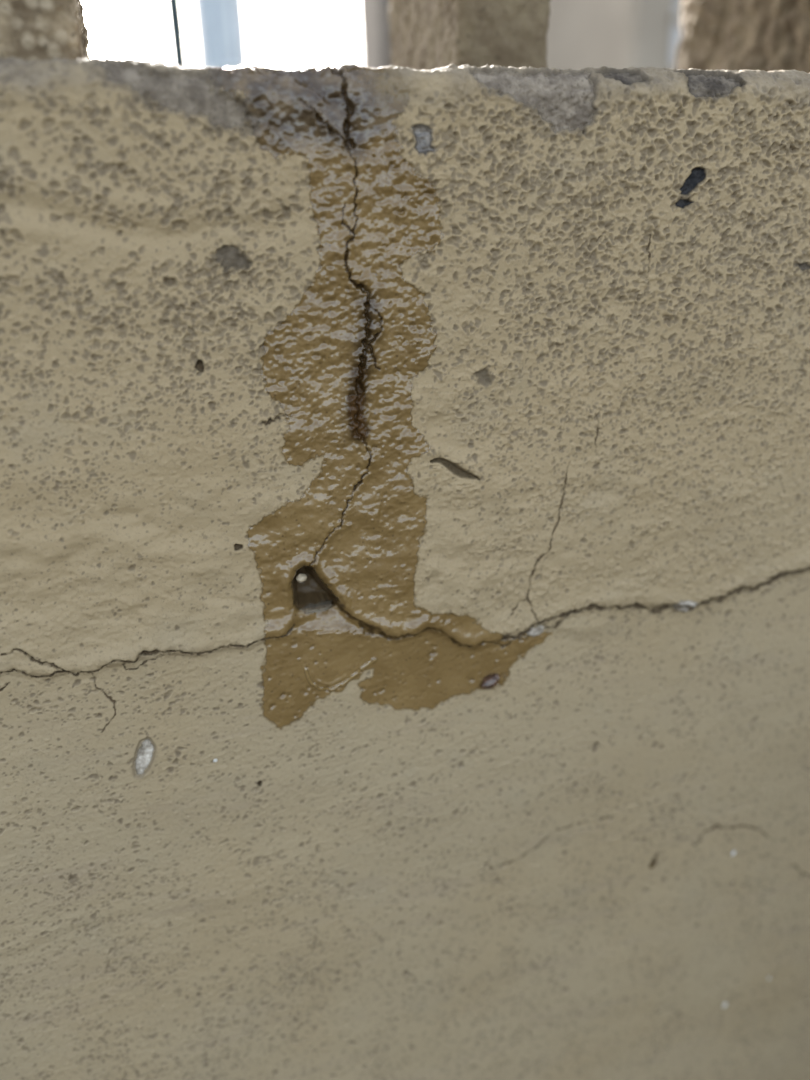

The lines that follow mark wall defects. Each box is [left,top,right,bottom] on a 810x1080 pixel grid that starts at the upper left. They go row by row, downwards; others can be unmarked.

crack [300,70,383,395]
damp [208,64,552,729]
crack [309,439,371,566]
crack [329,473,810,648]
crack [0,628,293,732]